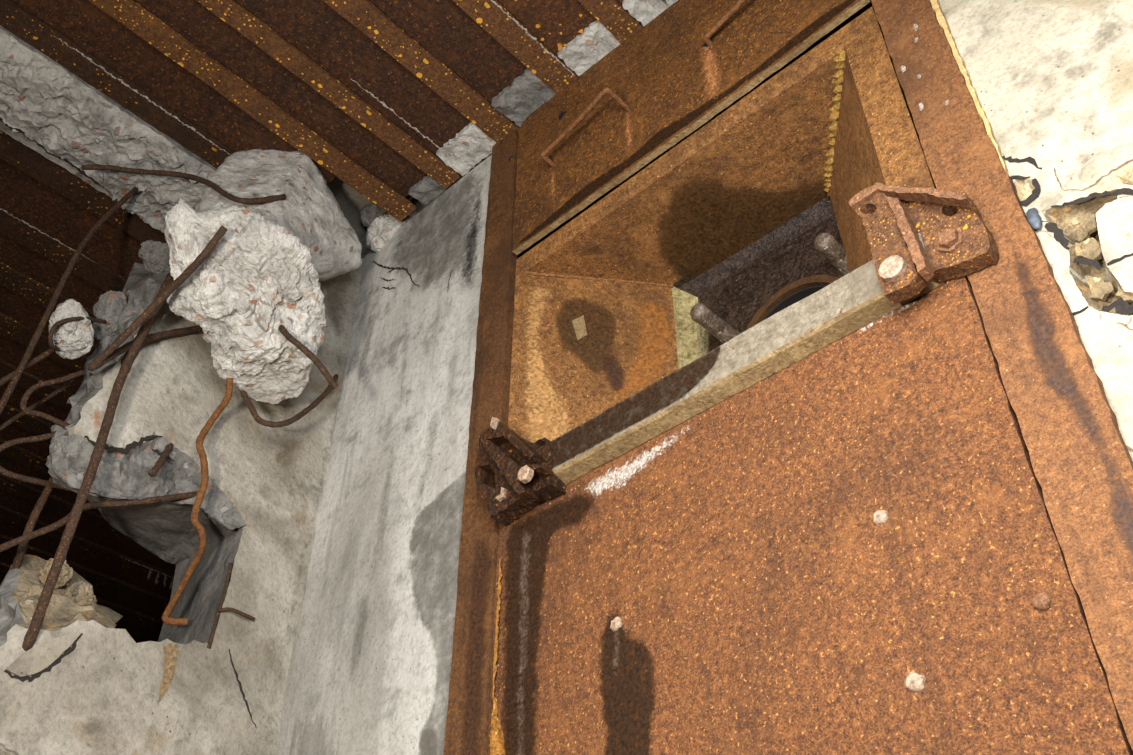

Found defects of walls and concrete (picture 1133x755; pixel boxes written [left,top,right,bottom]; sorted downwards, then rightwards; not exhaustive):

corrosion [703,47,720,98]
crack [1002,156,1133,191]
corrosion [525,288,571,443]
damp [539,299,720,468]
damp [658,178,830,285]
crack [1072,306,1133,330]
crack [1107,253,1133,276]
spalling [46,434,247,530]
peeling [158,644,177,702]
damp [411,482,465,755]
corrosion [490,559,506,755]
damp [503,436,674,755]